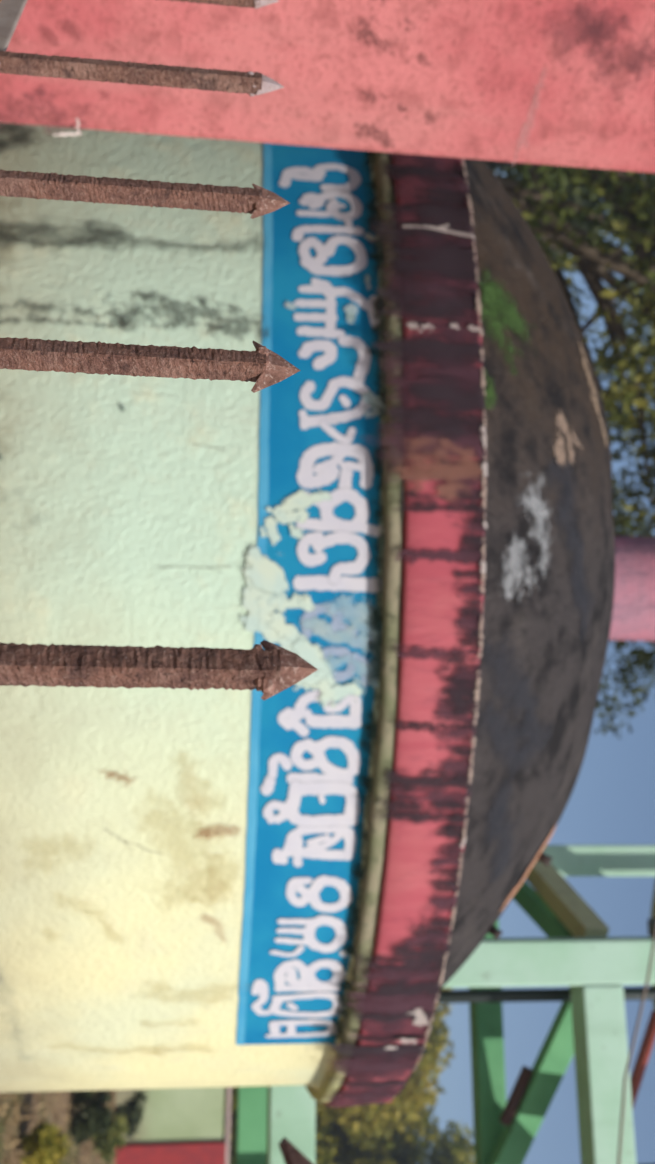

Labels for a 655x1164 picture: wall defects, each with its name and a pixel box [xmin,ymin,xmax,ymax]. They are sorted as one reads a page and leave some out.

spalling [554,414,582,464]
peeling [240,489,382,707]